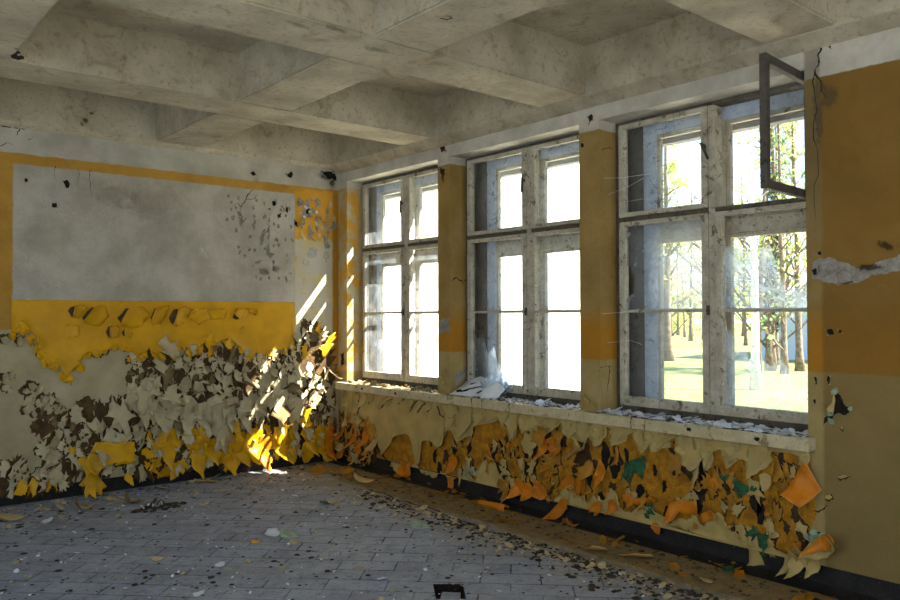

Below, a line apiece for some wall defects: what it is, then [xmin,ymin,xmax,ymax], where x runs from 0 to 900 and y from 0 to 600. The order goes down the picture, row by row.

crack [812,46,831,217]
peeling [237,197,337,283]
peeling [812,251,900,286]
peeling [0,300,834,579]
flaking render [814,375,852,432]